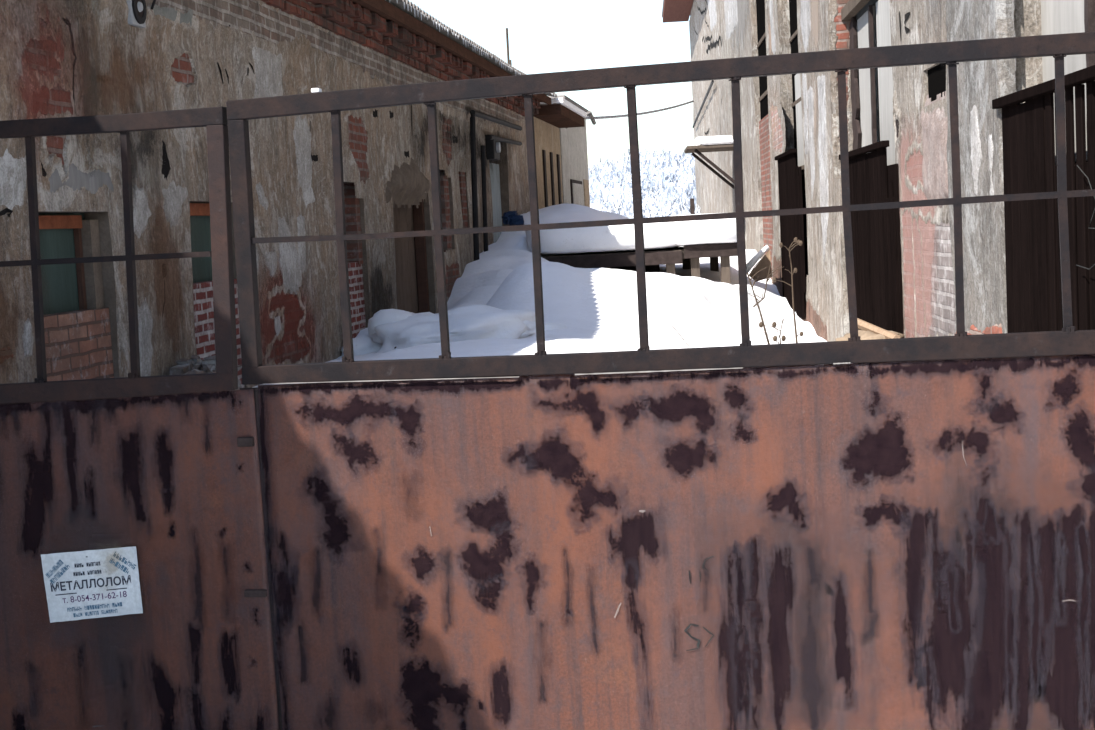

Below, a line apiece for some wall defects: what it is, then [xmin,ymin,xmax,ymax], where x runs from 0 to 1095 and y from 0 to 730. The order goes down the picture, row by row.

flaking render [145,0,444,98]
crack [0,208,13,217]
peeling [0,135,71,210]
peeling [256,116,319,365]
flaking render [768,89,786,168]
flaking render [893,90,1002,338]
rust [295,394,422,472]
rust [534,384,757,478]
rust [408,491,543,642]
rust [503,429,665,669]
rust [718,539,824,730]
rust [861,369,1095,730]